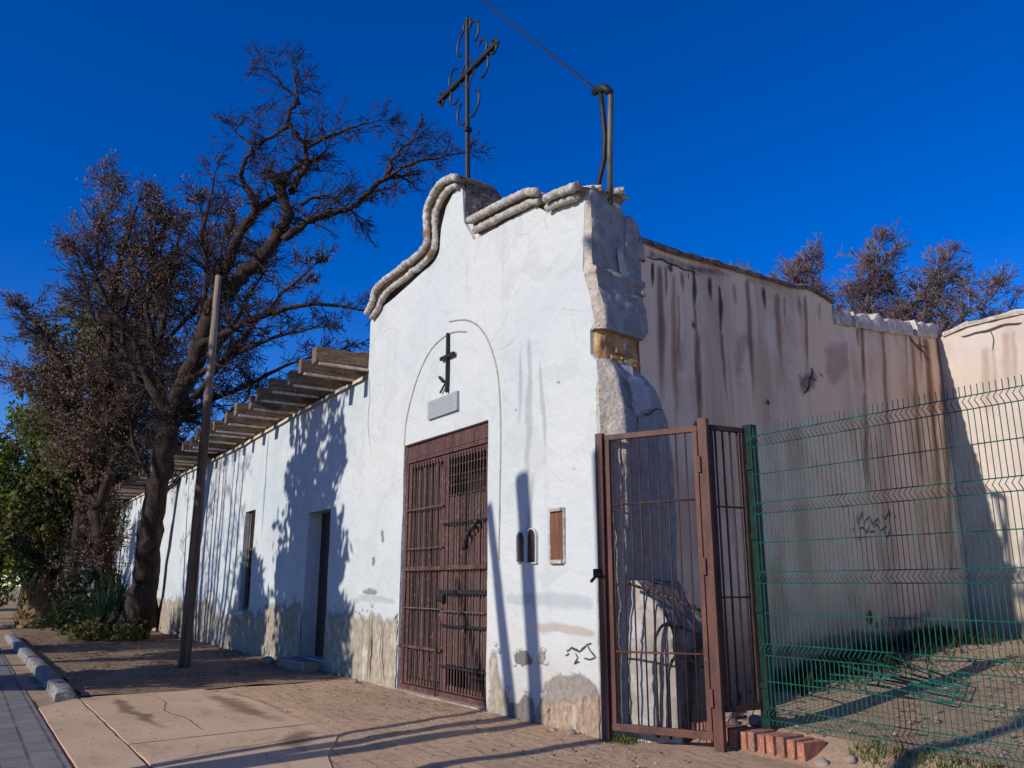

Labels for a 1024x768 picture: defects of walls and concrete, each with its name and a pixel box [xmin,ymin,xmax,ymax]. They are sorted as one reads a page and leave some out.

damp [651,253,667,361]
crack [647,256,698,277]
damp [682,267,725,418]
damp [734,283,752,360]
crack [962,323,1021,350]
flaking render [323,589,399,689]
flaking render [488,641,600,739]